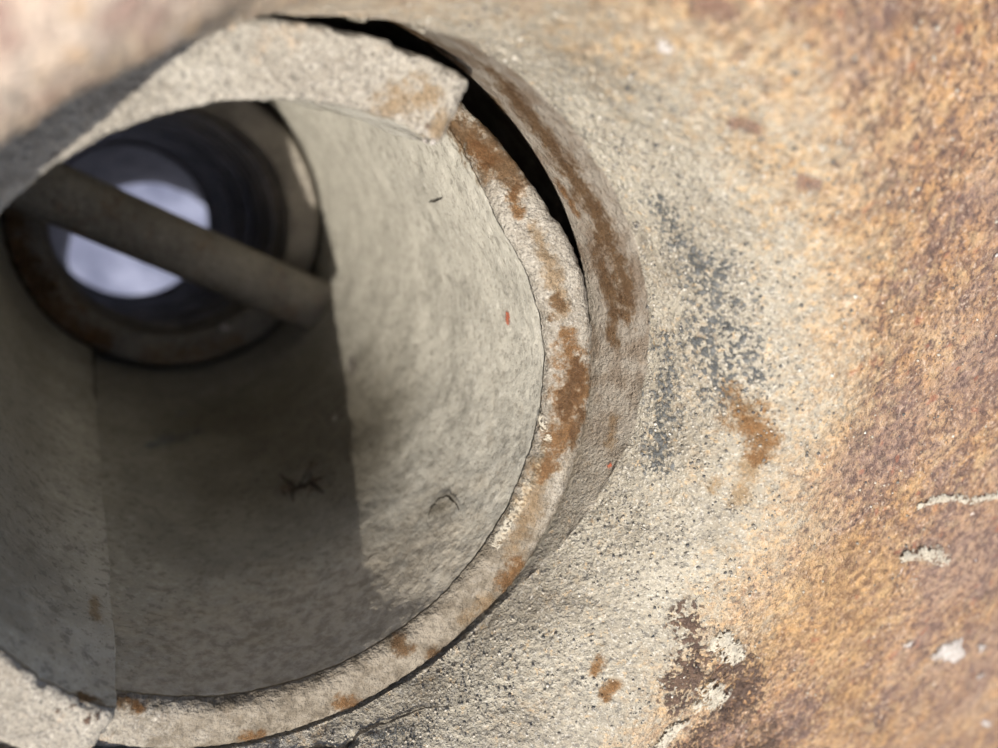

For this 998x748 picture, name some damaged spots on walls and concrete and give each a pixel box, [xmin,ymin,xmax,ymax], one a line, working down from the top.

rust [448,119,526,190]
rust [500,79,633,344]
crack [309,706,451,748]